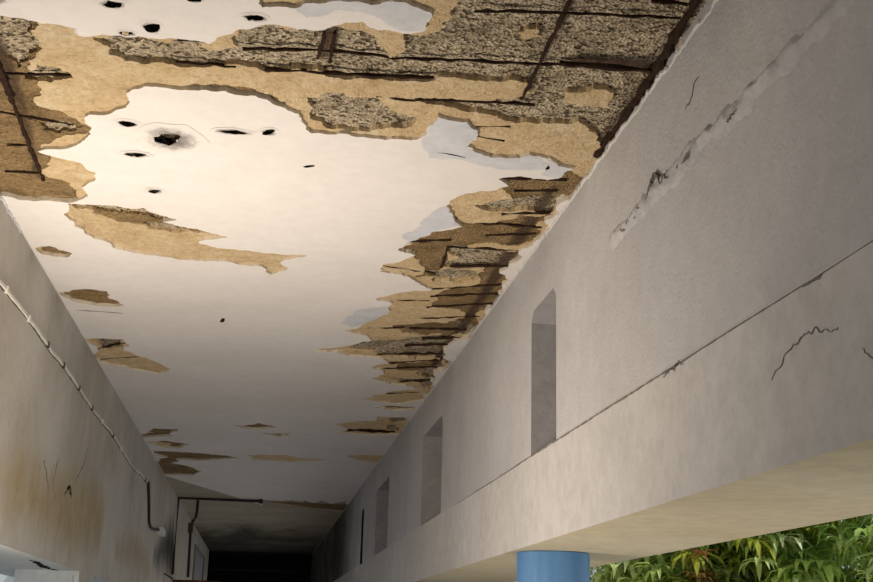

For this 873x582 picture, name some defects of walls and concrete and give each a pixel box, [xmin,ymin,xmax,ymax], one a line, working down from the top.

spalling [0,0,719,437]
damp [0,406,152,582]
crack [455,240,873,505]